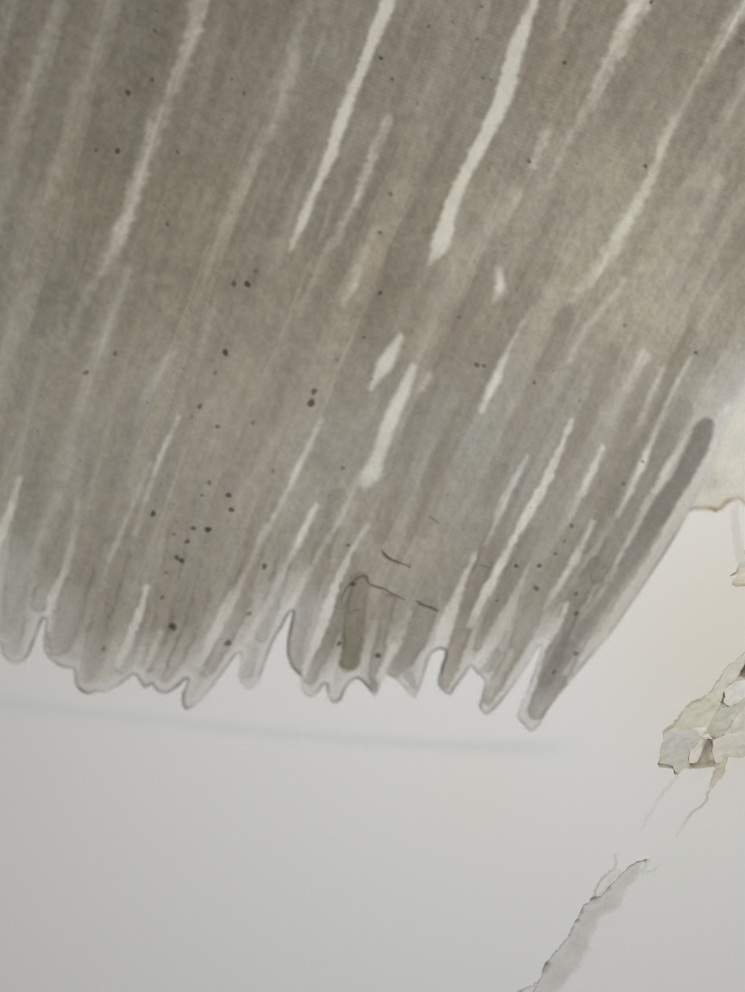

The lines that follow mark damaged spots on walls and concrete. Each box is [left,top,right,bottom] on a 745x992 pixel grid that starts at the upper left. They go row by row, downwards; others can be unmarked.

damp [0,0,745,761]
spalling [658,652,745,790]
crack [674,790,711,840]
crack [516,853,662,992]